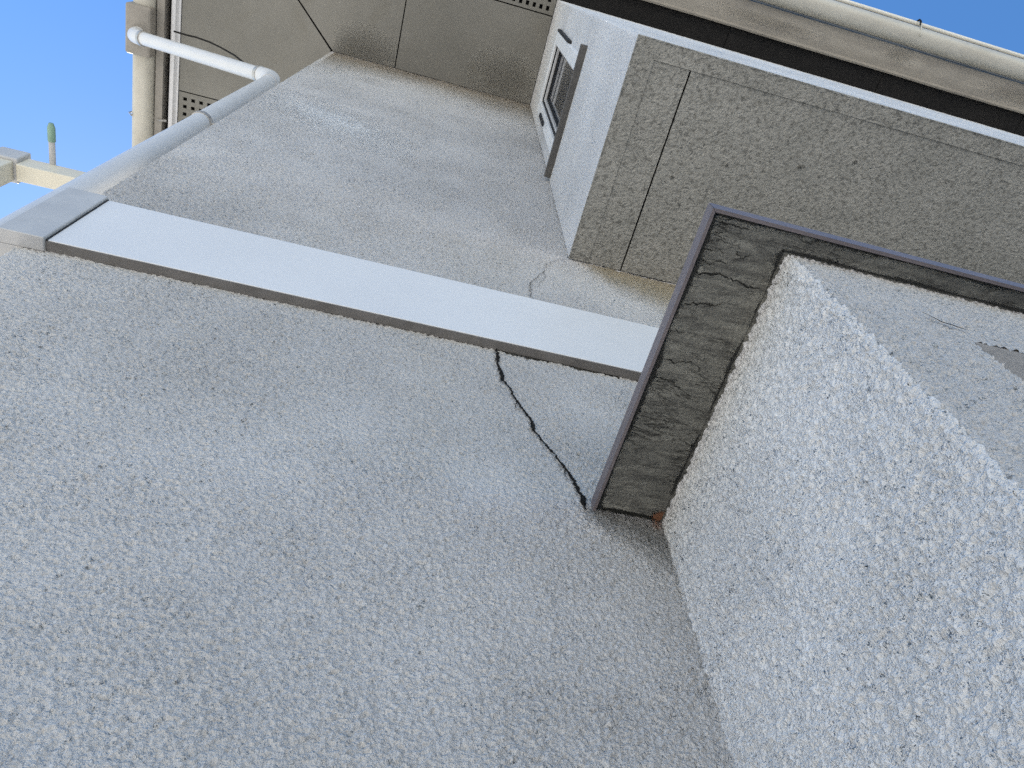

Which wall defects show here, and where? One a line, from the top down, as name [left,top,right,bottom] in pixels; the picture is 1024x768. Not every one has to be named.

crack [495,348,655,520]